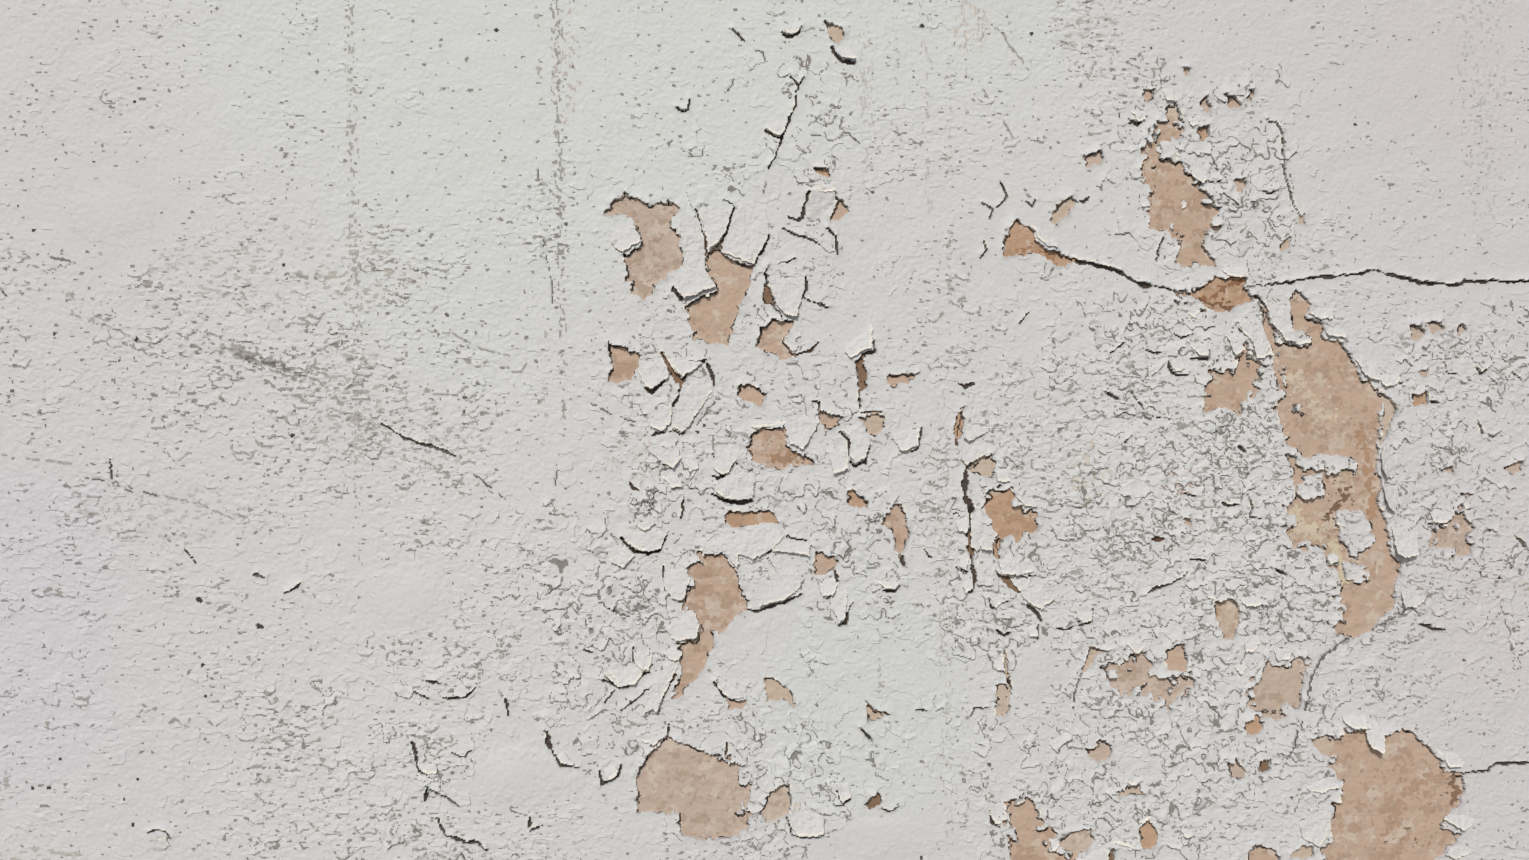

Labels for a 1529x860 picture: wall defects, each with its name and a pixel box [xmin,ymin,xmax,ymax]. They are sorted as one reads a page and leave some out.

crack [1242,269,1529,346]
peeling [92,195,527,499]
crack [1430,361,1523,404]
peeling [438,12,1529,860]
crack [1476,418,1499,437]
peeling [29,472,142,556]
crack [1513,534,1529,551]
peeling [147,554,248,628]
peeling [357,631,425,704]
crack [1280,609,1445,773]
peeling [204,664,500,860]
crack [1450,761,1529,776]